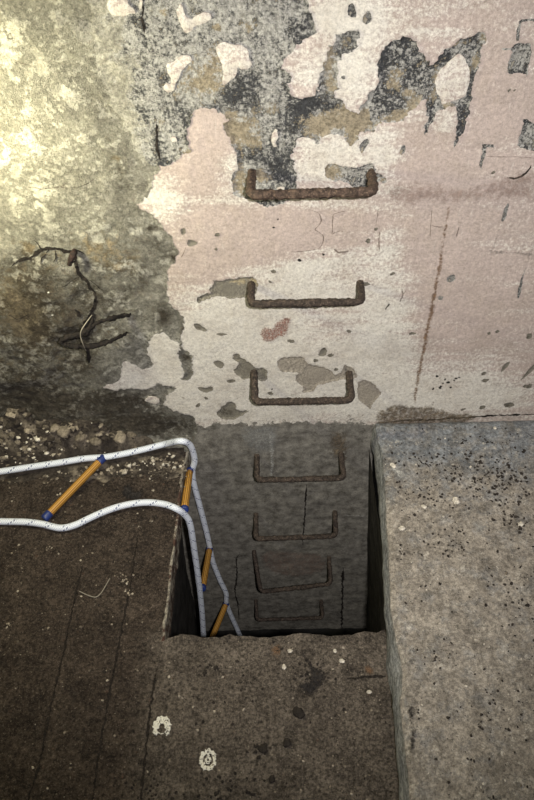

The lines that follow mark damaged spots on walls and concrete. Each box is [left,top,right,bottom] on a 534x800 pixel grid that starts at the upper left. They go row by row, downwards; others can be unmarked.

spalling [479,144,494,169]
spalling [0,0,487,455]
crack [12,240,100,325]